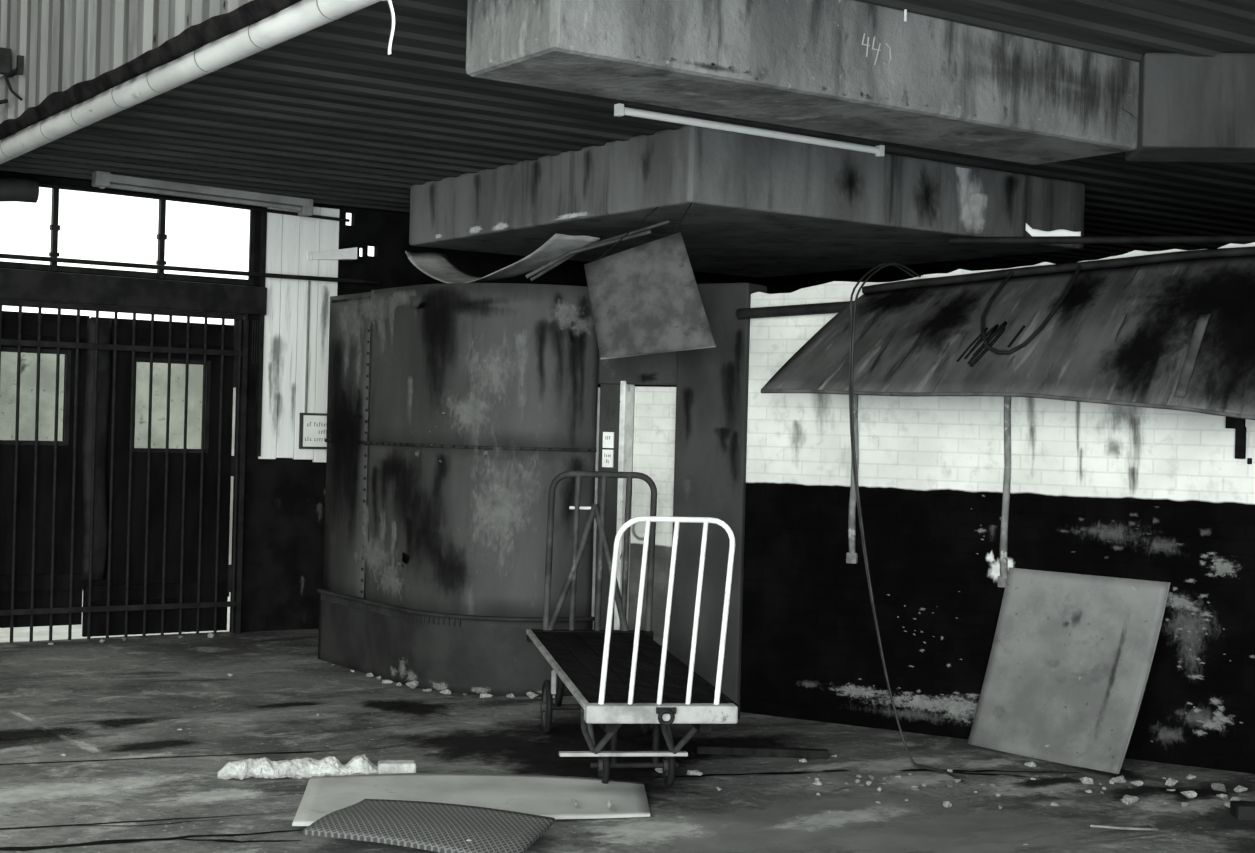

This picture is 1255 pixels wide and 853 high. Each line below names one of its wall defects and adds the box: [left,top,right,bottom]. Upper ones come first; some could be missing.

leakage [916,176,936,215]
spalling [470,222,508,234]
spalling [556,212,587,220]
leakage [1113,406,1138,444]